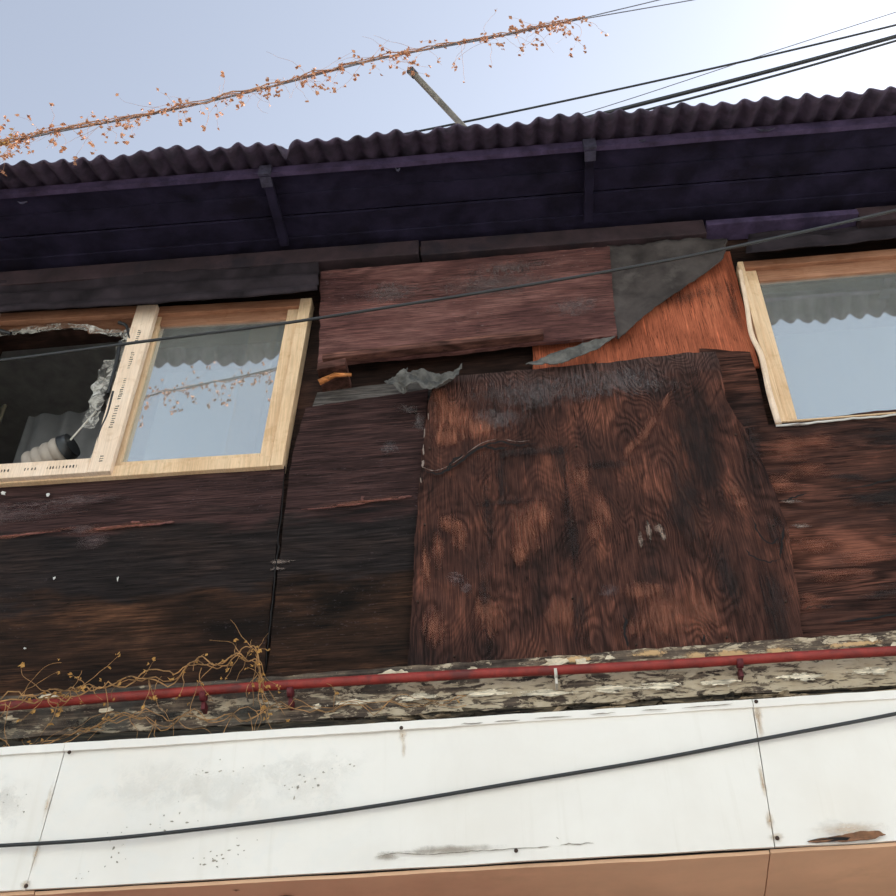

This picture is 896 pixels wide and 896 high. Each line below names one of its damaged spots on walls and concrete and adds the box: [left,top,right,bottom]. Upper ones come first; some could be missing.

peeling [830,637,877,647]
peeling [540,656,591,666]
peeling [846,667,889,675]
peeling [775,673,825,681]
peeling [588,681,686,694]
peeling [701,678,742,687]
peeling [396,693,437,701]
peeling [469,689,577,697]
peeling [313,698,373,709]
corrosion [807,831,886,843]